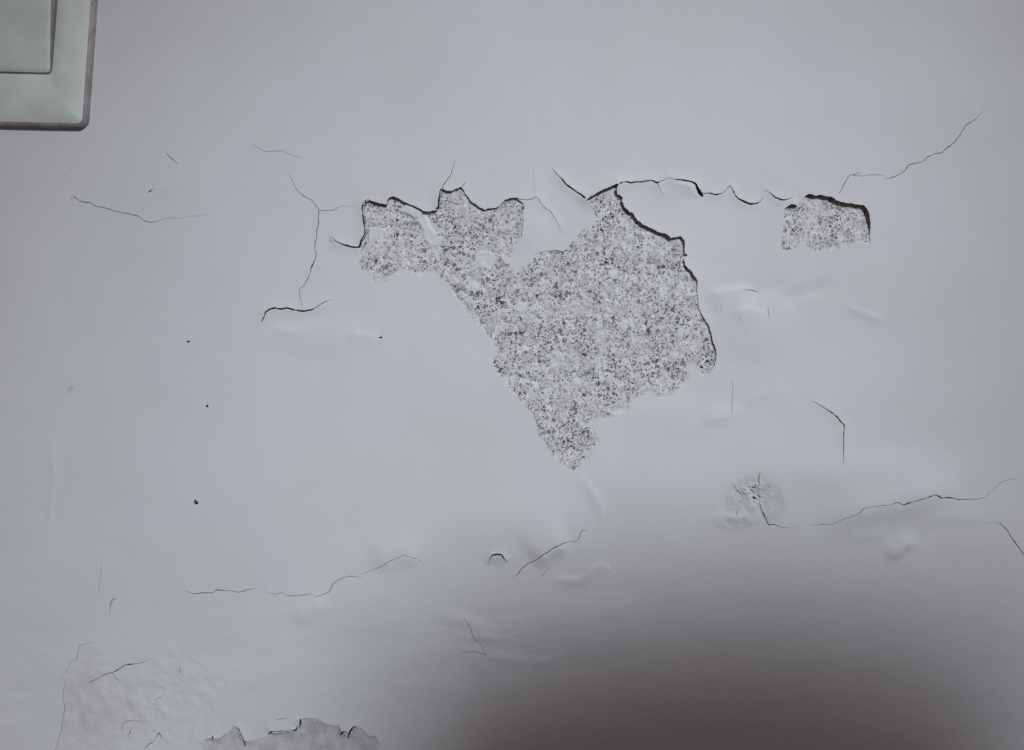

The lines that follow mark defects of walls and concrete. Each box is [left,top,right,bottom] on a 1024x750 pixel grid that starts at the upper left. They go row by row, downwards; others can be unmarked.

crack [839,108,987,193]
crack [533,170,586,199]
crack [620,177,792,205]
crack [254,145,369,322]
flaking render [780,194,871,253]
flaking render [358,184,717,471]
crack [812,401,845,462]
crack [820,478,1015,525]
crack [186,555,424,597]
crack [488,530,585,578]
peeling [55,642,381,750]